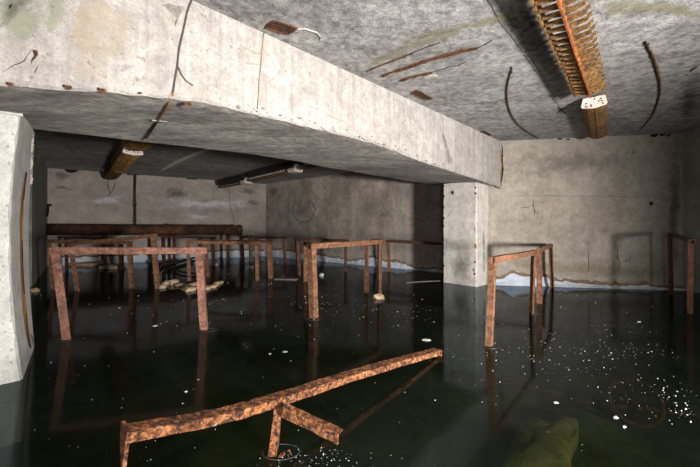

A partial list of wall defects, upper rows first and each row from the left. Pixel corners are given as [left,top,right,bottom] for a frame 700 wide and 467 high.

crack [256,33,264,112]
corrosion [20,172,31,348]
damp [316,252,444,273]
damp [496,270,687,291]